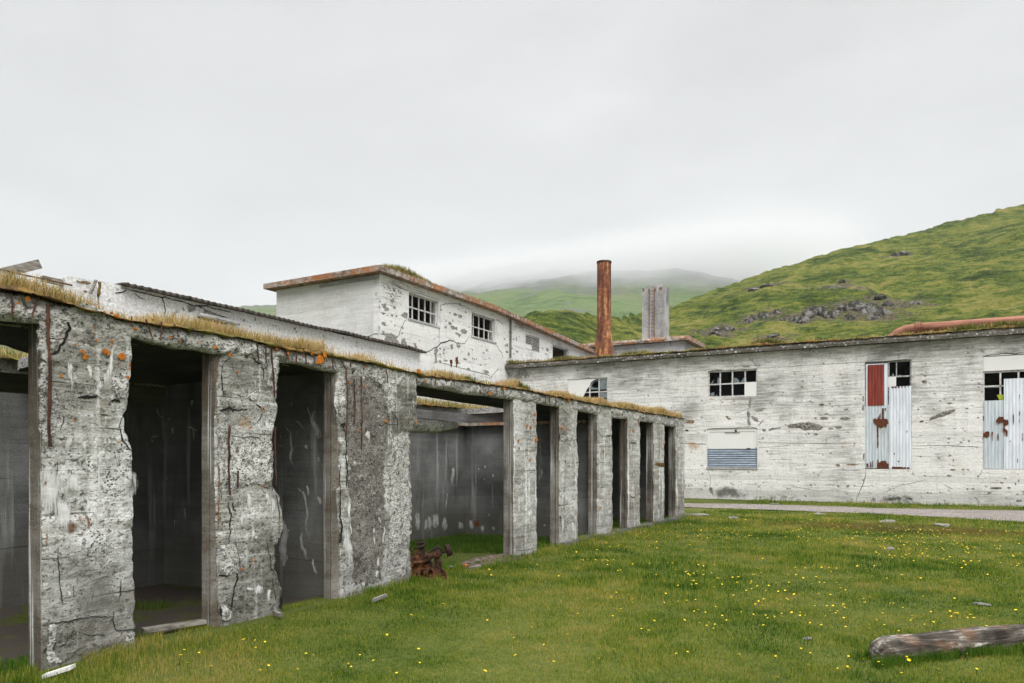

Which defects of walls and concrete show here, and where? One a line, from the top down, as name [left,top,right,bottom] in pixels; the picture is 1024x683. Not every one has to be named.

spalling [378,285,420,348]
crack [51,322,72,355]
spalling [434,309,490,394]
crack [427,320,550,378]
crack [60,395,133,452]
spalling [747,392,851,435]
corrosion [873,408,900,447]
spalling [917,402,969,423]
corrosion [983,411,1023,442]